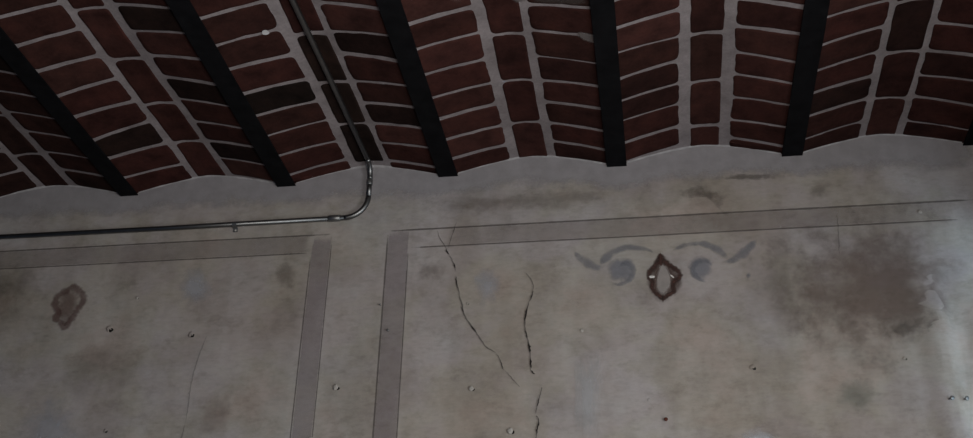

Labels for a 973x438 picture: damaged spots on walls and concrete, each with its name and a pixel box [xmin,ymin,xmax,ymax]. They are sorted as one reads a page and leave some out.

crack [438,224,542,437]